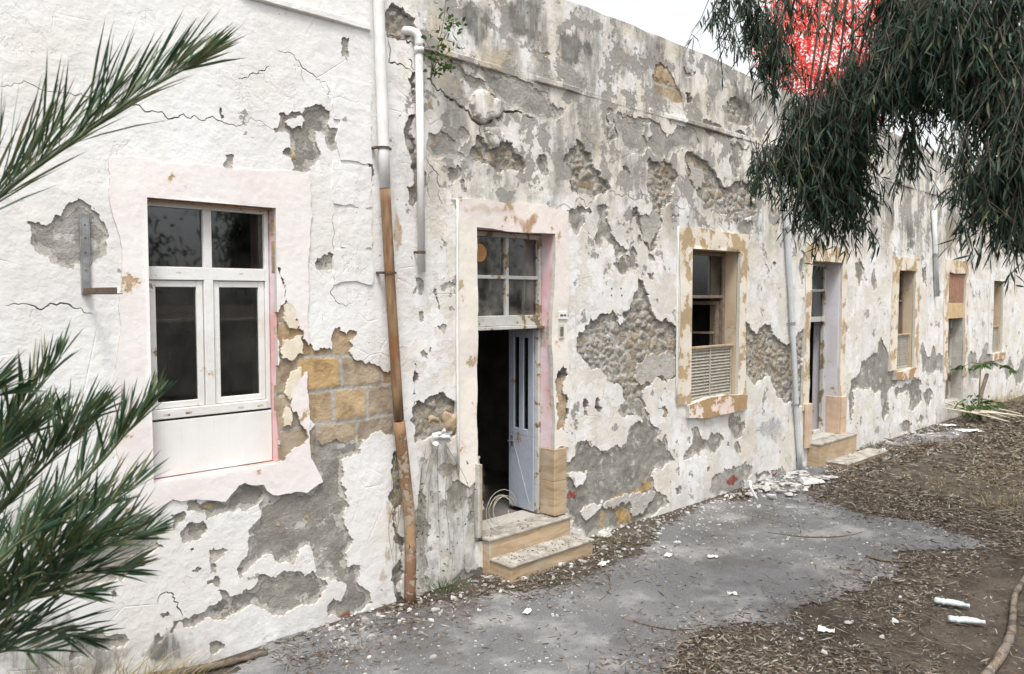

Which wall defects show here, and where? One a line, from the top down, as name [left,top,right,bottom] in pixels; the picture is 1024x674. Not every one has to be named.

spalling [272,105,337,173]
spalling [27,199,109,269]
crack [5,302,85,313]
spalling [848,338,950,433]
spalling [154,301,394,642]